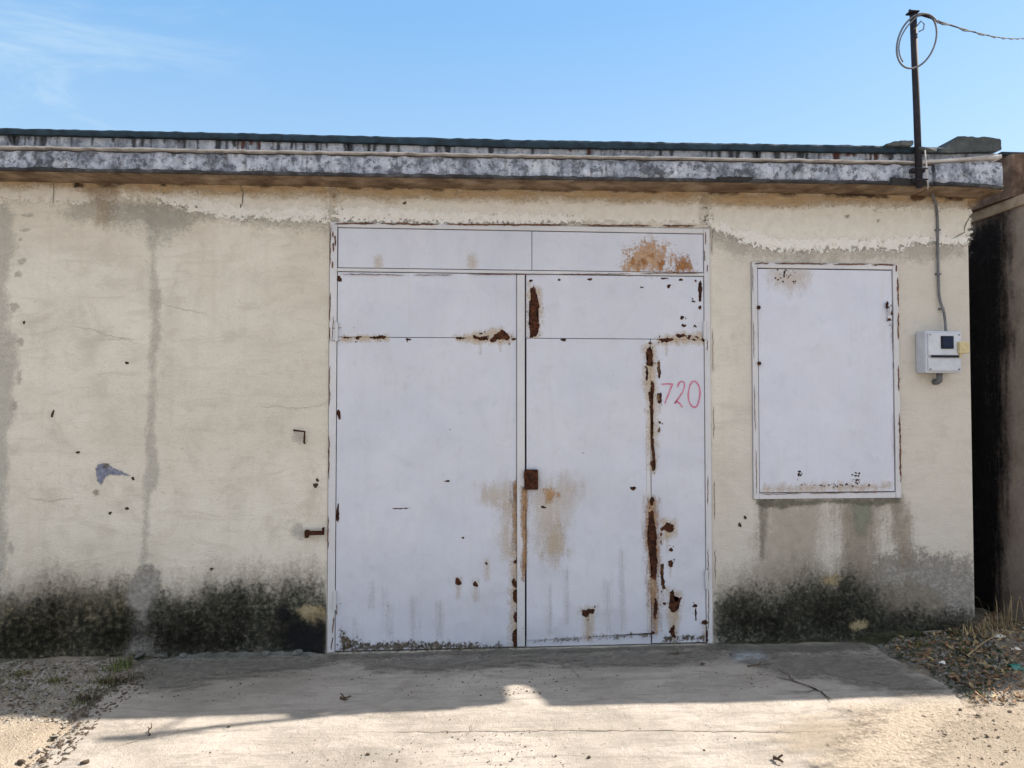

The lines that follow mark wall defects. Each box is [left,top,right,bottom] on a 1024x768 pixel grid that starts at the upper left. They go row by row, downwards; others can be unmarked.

corrosion [329,222,565,282]
corrosion [456,326,516,345]
peeling [0,182,974,254]
corrosion [468,274,545,339]
corrosion [558,224,713,310]
corrosion [645,316,713,474]
water stain [0,212,1011,768]
corrosion [756,454,880,495]
corrosion [511,481,528,648]
corrosion [644,497,716,642]